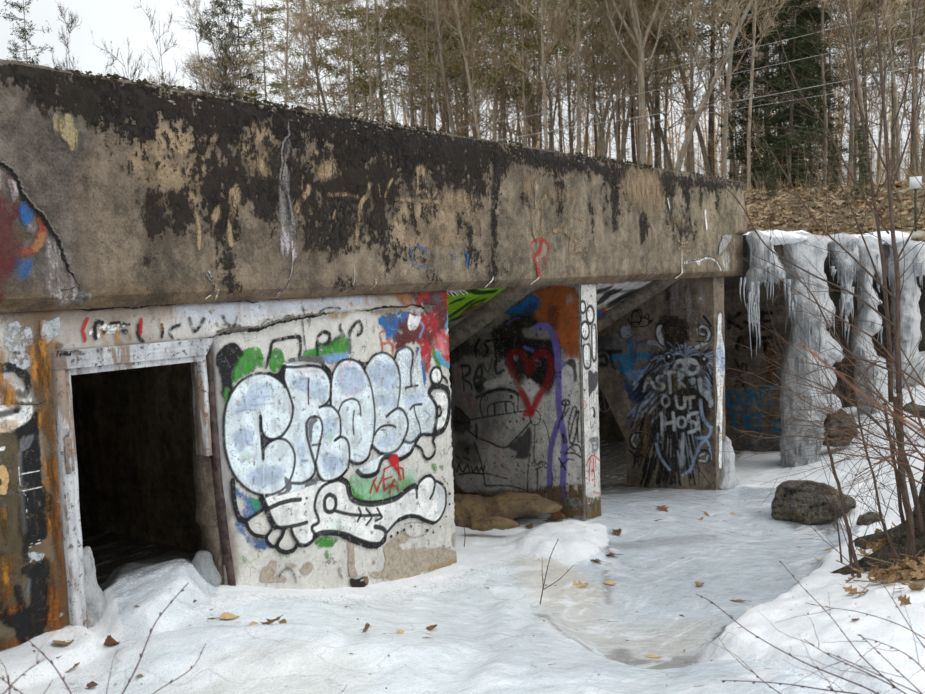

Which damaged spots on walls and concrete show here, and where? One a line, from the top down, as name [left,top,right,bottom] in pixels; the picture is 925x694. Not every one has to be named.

damp [0,63,743,303]
crack [0,158,188,311]
damp [666,257,727,308]
peeling [260,561,313,583]
peeling [339,532,457,587]